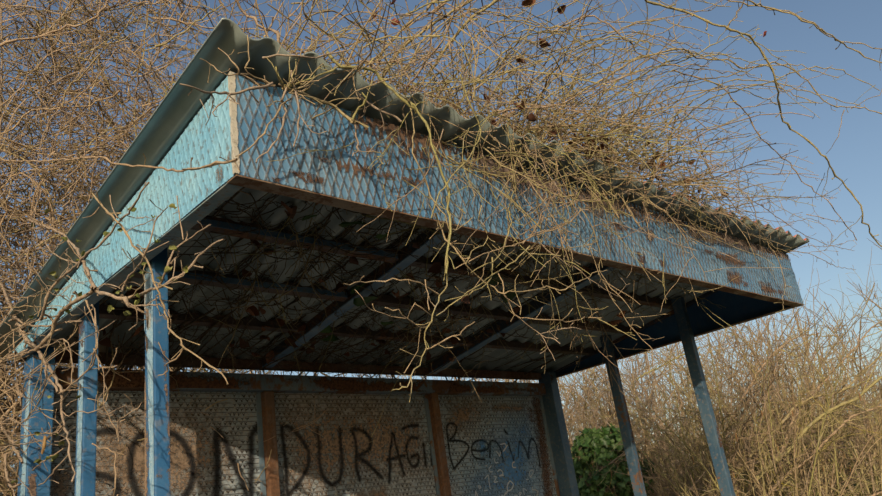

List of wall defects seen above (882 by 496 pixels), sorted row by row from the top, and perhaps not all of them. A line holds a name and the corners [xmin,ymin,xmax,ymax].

rust [314,156,422,185]
rust [352,111,791,296]
rust [98,369,145,387]
rust [169,372,249,389]